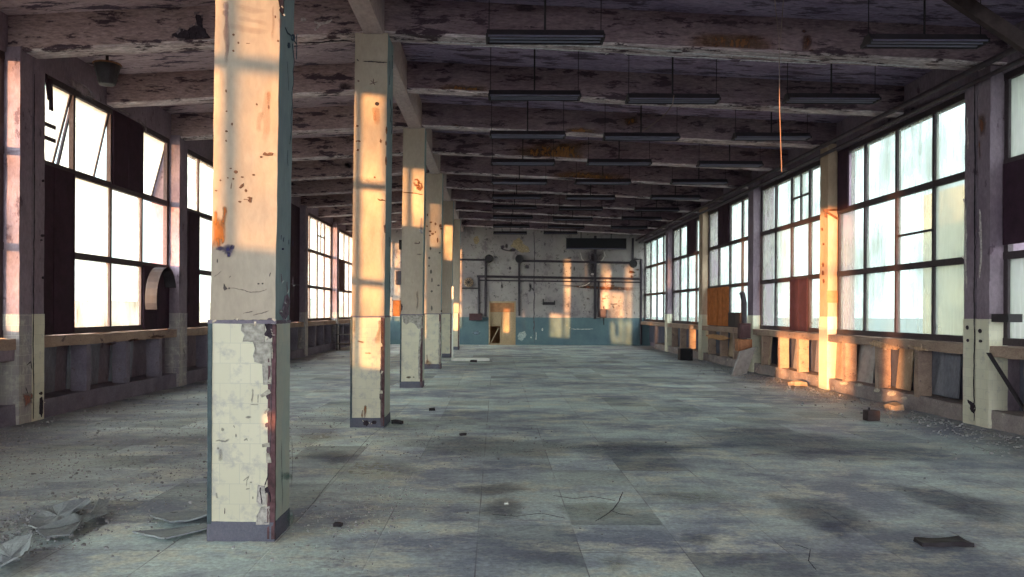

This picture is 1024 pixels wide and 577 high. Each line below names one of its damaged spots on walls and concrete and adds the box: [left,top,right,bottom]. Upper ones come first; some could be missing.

spalling [172,12,211,40]
corrosion [213,207,227,246]
peeling [234,273,295,463]
peeling [256,485,270,525]
crack [493,492,625,521]